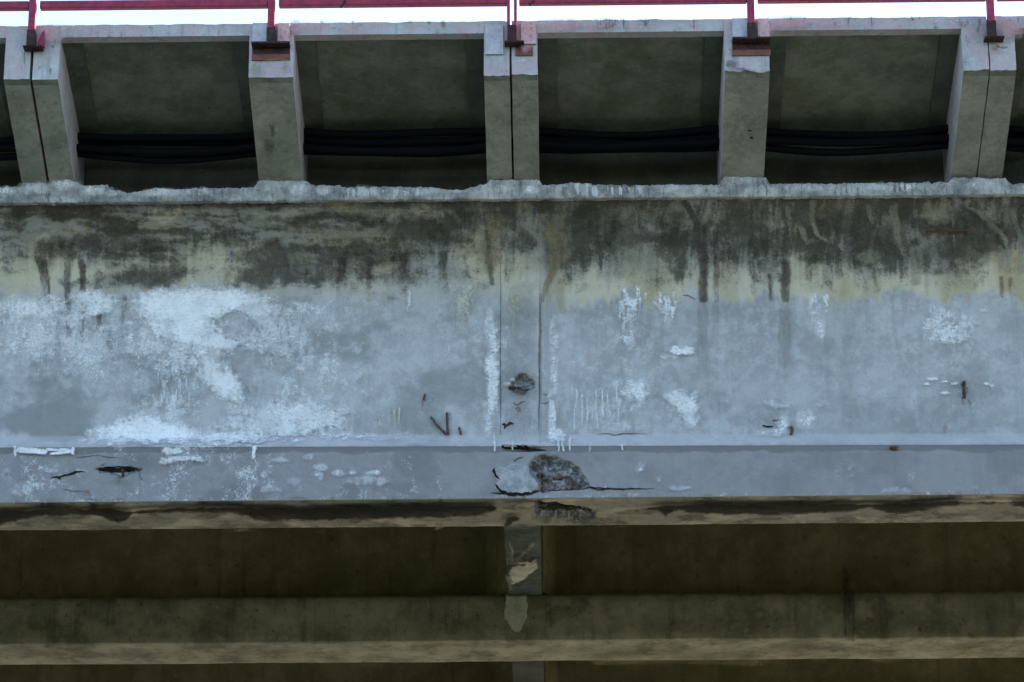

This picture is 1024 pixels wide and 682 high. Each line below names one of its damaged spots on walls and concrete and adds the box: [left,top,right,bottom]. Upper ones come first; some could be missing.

water stain [35,203,186,302]
water stain [167,201,1024,302]
peeling [484,310,535,451]
crack [51,455,143,492]
water stain [0,505,522,529]
spalling [530,380,649,523]
crack [567,484,652,492]
water stain [642,501,1024,516]